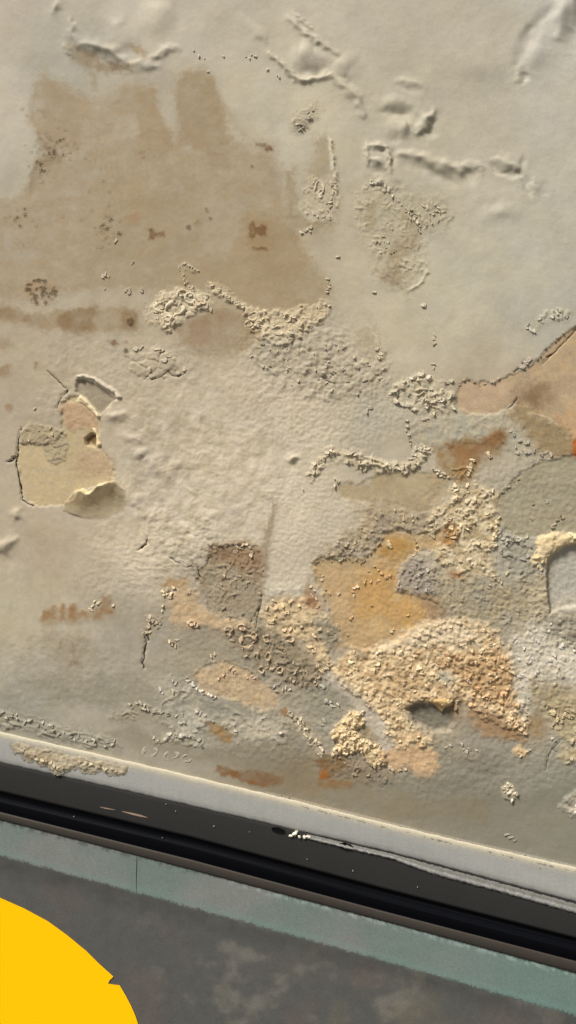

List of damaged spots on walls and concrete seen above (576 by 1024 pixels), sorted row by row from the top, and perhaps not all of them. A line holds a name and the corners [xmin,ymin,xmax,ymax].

water stain [0,39,340,318]
spalling [9,373,126,520]
flaking render [138,303,576,779]
peeling [0,700,208,776]